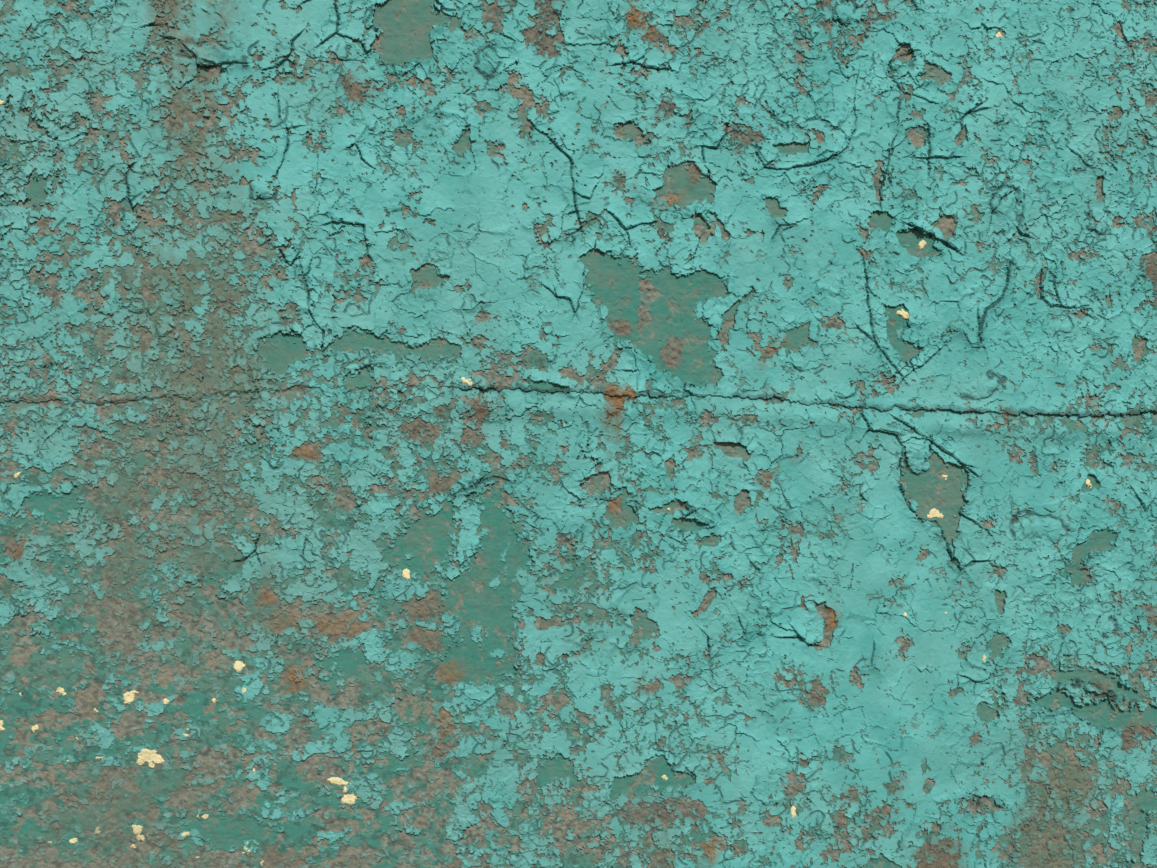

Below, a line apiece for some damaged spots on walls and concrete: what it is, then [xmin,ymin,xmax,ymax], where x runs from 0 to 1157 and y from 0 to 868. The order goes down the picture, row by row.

crack [124,162,136,213]
crack [143,0,375,178]
peeling [361,0,464,77]
crack [531,123,657,242]
crack [614,55,673,72]
peeling [578,111,766,397]
crack [701,47,988,211]
crack [0,190,1157,571]
peeling [891,433,976,575]
peeling [375,484,541,702]
peeling [136,749,164,768]
peeling [327,777,357,804]